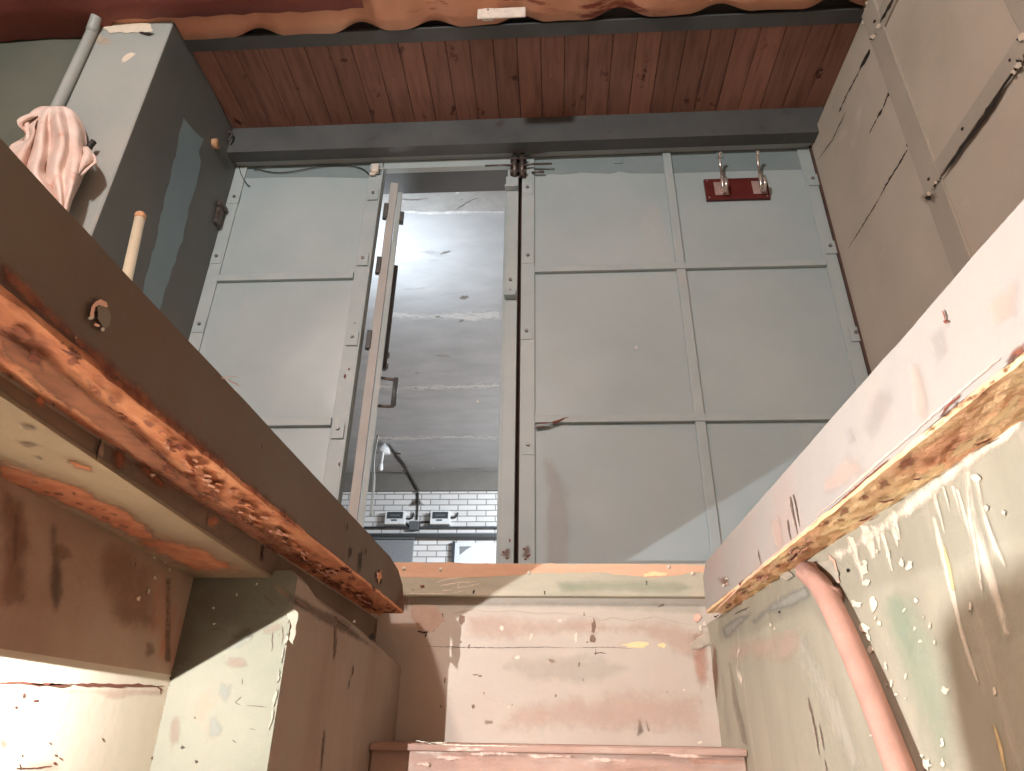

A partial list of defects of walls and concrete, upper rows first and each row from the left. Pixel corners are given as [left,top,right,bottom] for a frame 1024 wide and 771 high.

crack [818,0,893,159]
crack [932,55,1024,190]
crack [849,144,908,247]
rust [3,265,228,471]
rust [5,498,26,600]
rust [0,464,229,572]
peeling [164,441,235,493]
peeling [846,521,913,654]
peeling [920,738,945,771]